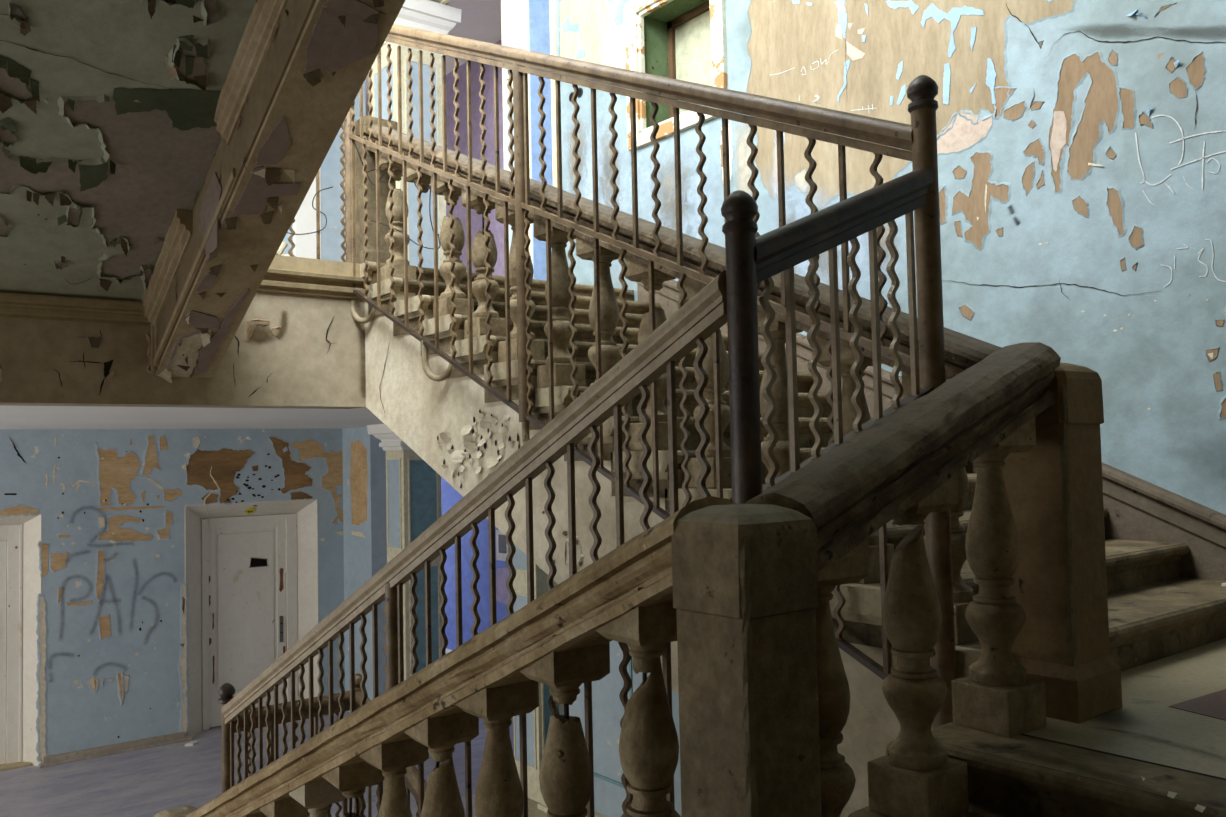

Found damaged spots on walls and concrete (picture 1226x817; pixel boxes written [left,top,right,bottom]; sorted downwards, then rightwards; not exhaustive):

peeling [0,3,31,36]
peeling [193,0,223,26]
peeling [559,0,631,69]
crack [1006,4,1226,49]
peeling [1126,2,1177,20]
peeling [746,0,1154,252]
peeling [0,56,301,384]
peeling [1105,185,1145,271]
peeling [1205,347,1226,421]
flaking render [436,410,520,488]
peeling [0,493,40,518]
peeling [36,433,369,762]